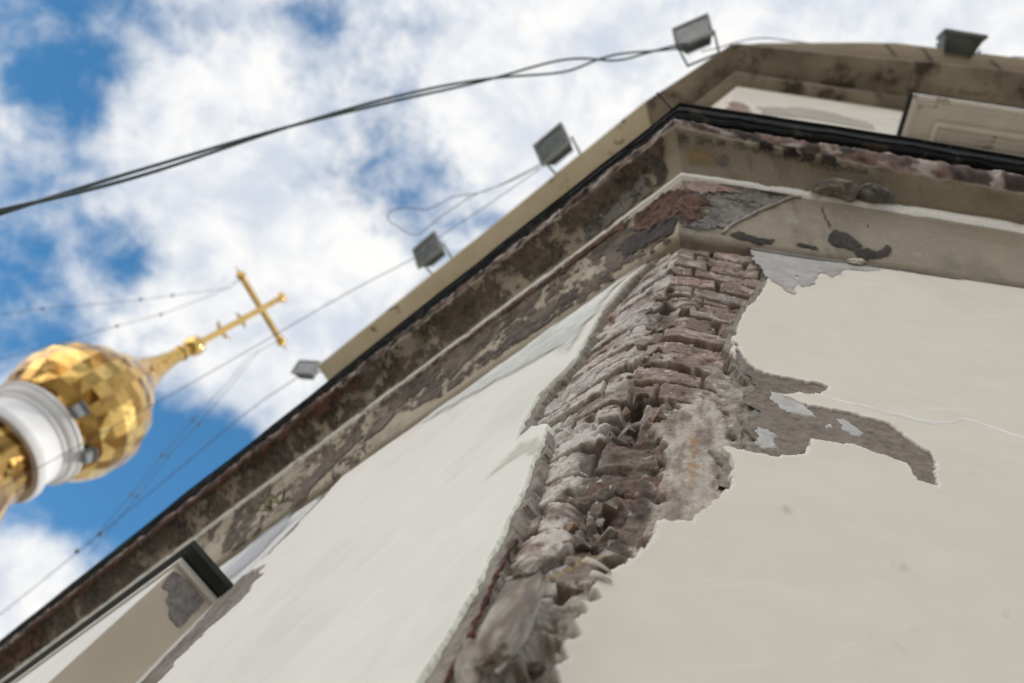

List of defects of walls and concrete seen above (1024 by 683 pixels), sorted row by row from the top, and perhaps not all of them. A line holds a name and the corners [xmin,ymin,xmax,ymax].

spalling [425,229,961,683]
crack [815,393,1024,438]
flaking render [268,490,330,555]
flaking render [140,571,260,683]